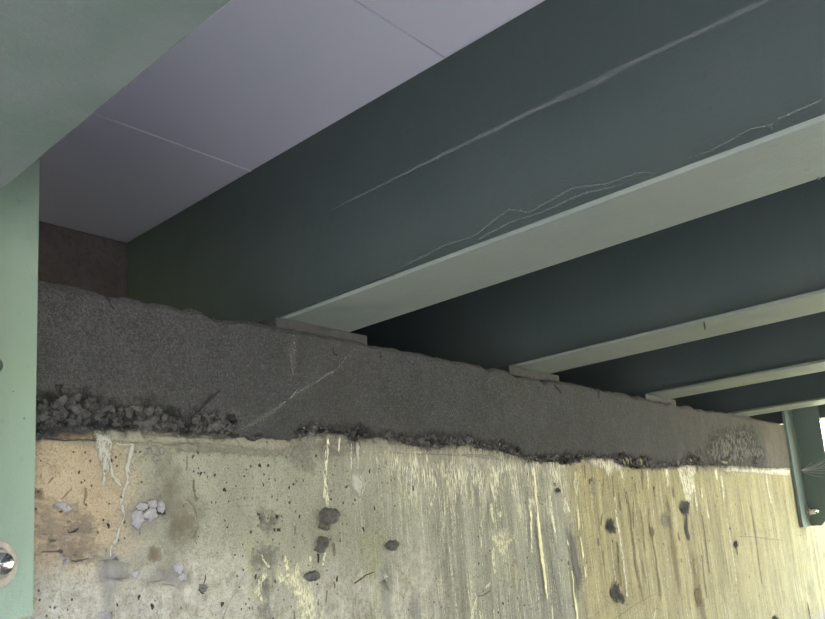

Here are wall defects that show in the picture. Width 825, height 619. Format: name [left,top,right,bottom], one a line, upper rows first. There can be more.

spalling [35,384,239,459]
crack [247,348,350,426]